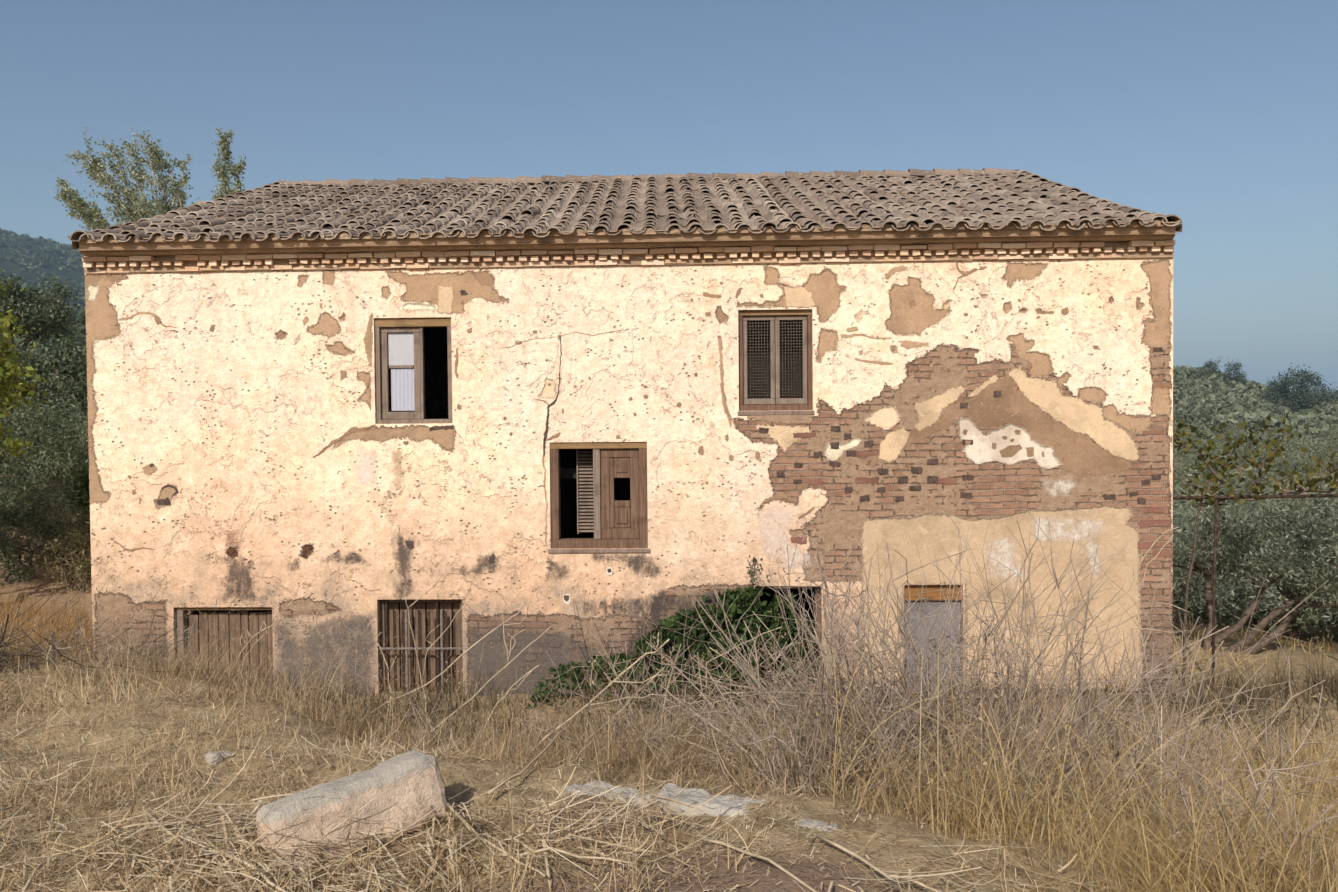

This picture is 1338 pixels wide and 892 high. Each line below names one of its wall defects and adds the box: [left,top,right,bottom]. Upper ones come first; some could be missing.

spalling [297,270,336,288]
peeling [381,269,510,316]
spalling [85,274,128,504]
flaking render [128,465,179,510]
spalling [302,303,456,457]
crack [501,329,628,546]
flaking render [703,258,1173,697]
leakage [396,537,414,596]
leakage [459,554,496,573]
leakage [93,591,168,672]
leakage [277,597,372,695]
leakage [465,583,754,698]